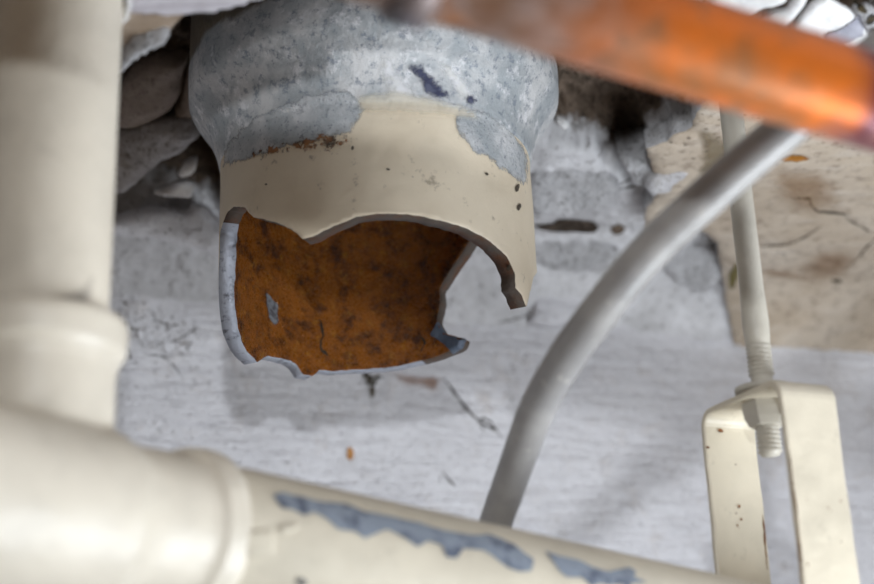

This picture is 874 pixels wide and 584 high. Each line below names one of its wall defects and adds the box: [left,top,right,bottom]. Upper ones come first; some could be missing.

peeling [123,0,253,16]
peeling [720,0,874,43]
spalling [120,27,170,73]
peeling [409,66,448,98]
peeling [154,156,197,198]
crack [761,197,874,272]
crack [443,378,503,439]